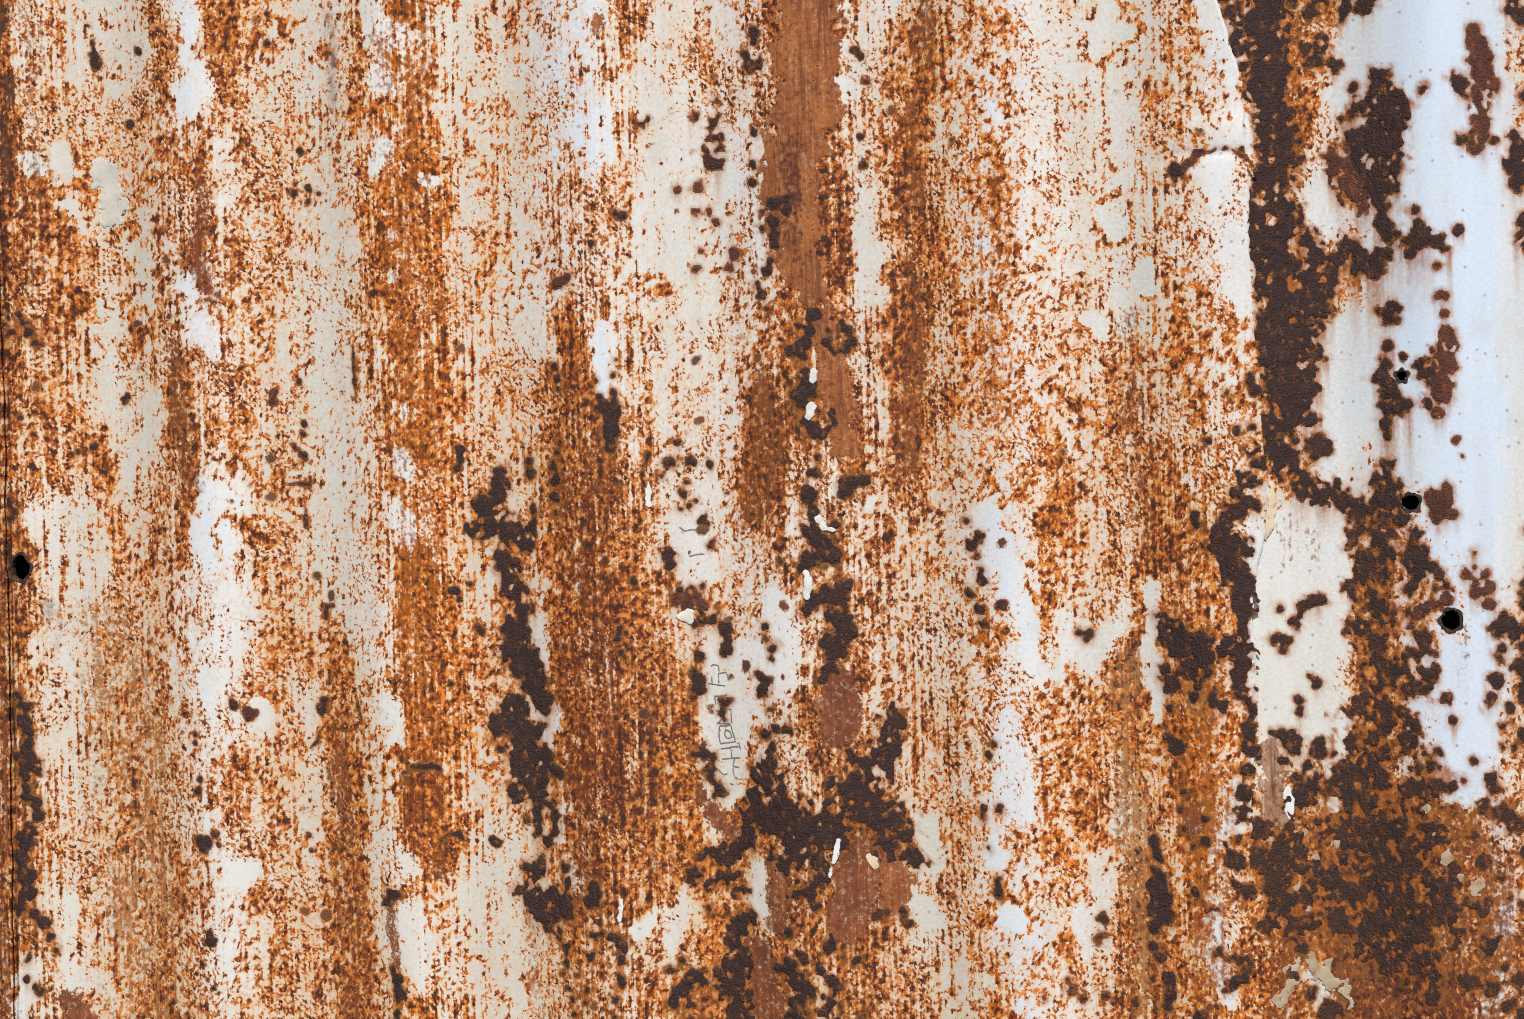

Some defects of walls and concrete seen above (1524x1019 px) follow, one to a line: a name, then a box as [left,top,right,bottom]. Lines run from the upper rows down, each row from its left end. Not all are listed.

corrosion [4,245,45,350]
corrosion [185,158,221,304]
corrosion [972,173,1013,430]
spalling [1452,223,1465,238]
corrosion [167,339,199,506]
corrosion [2,490,19,524]
corrosion [369,0,937,1019]
corrosion [0,551,60,1016]
corrosion [81,584,186,1019]